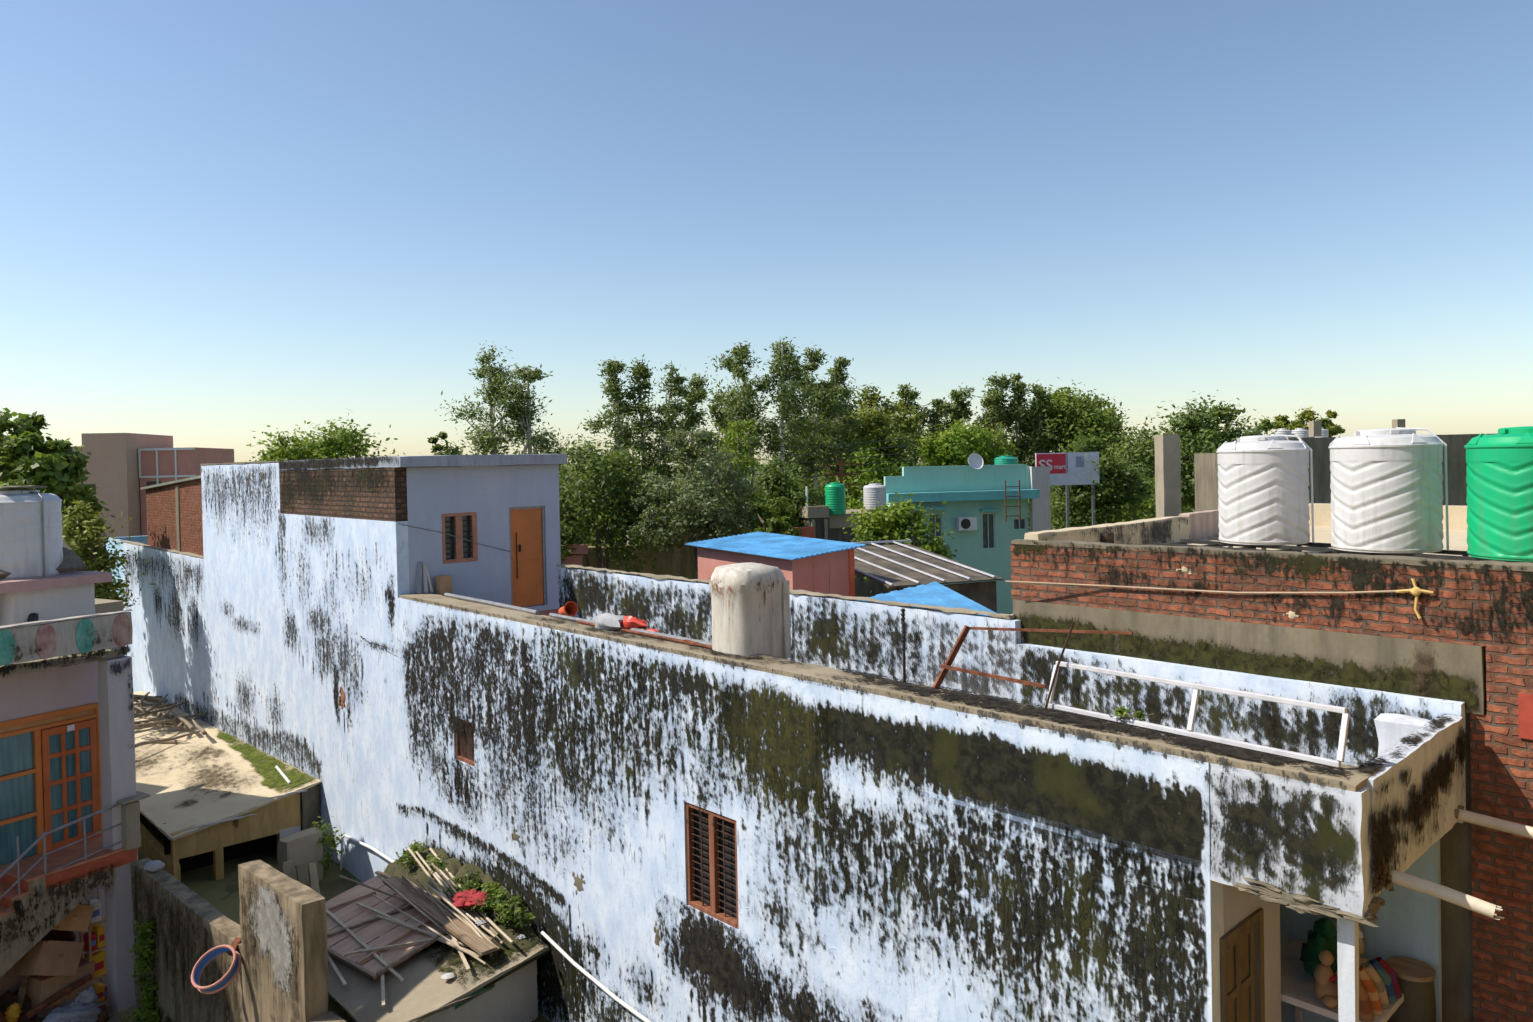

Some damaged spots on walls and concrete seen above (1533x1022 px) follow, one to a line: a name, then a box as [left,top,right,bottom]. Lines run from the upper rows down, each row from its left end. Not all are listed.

leakage [128,670,322,808]
leakage [201,456,1533,1022]
leakage [0,864,114,942]
leakage [132,870,300,1022]